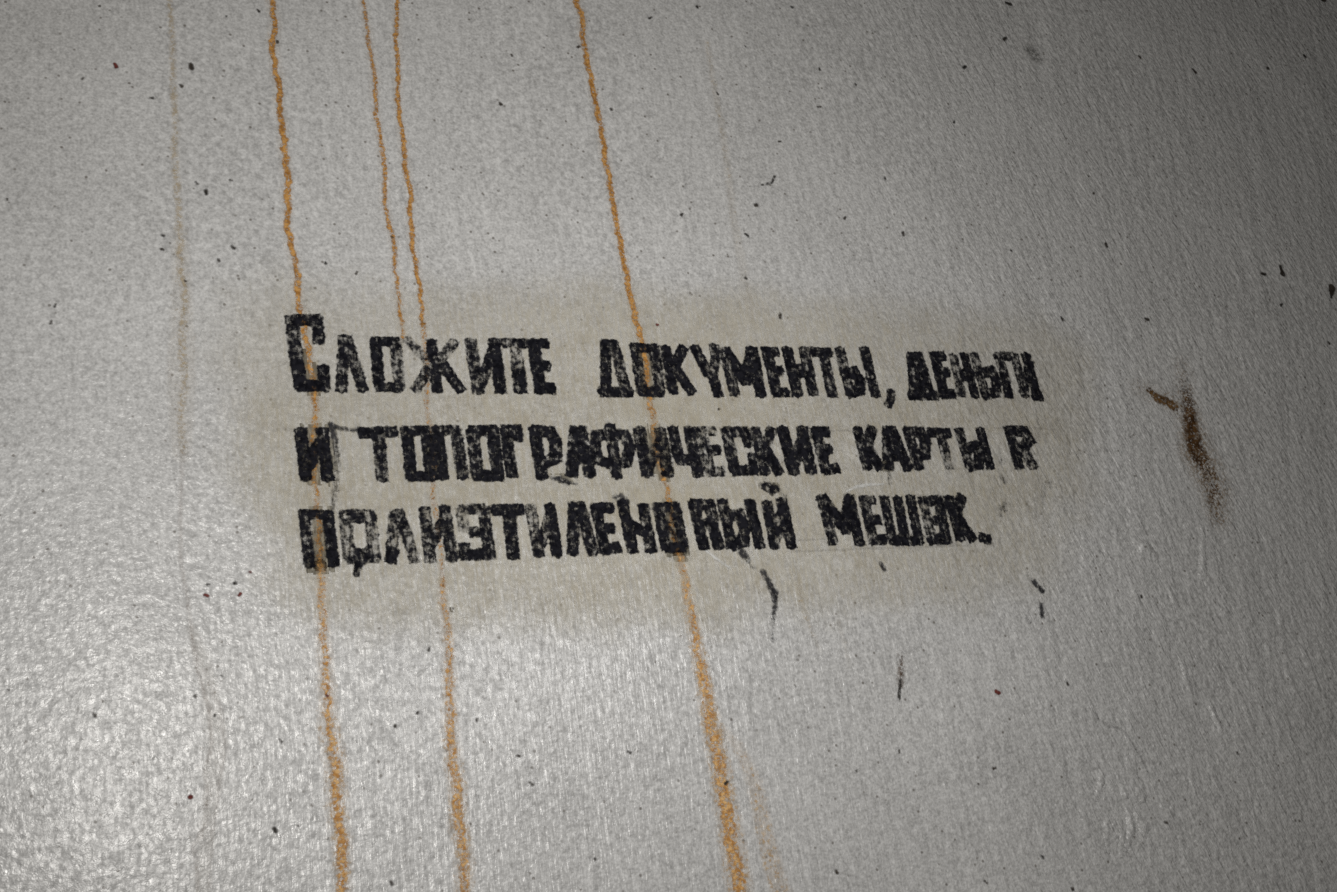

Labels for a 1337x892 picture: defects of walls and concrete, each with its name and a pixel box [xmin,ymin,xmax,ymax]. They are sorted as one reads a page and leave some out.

corrosion [269,0,318,441]
corrosion [362,0,429,364]
corrosion [573,0,747,892]
corrosion [1139,376,1225,521]
corrosion [311,465,351,892]
corrosion [439,540,470,892]